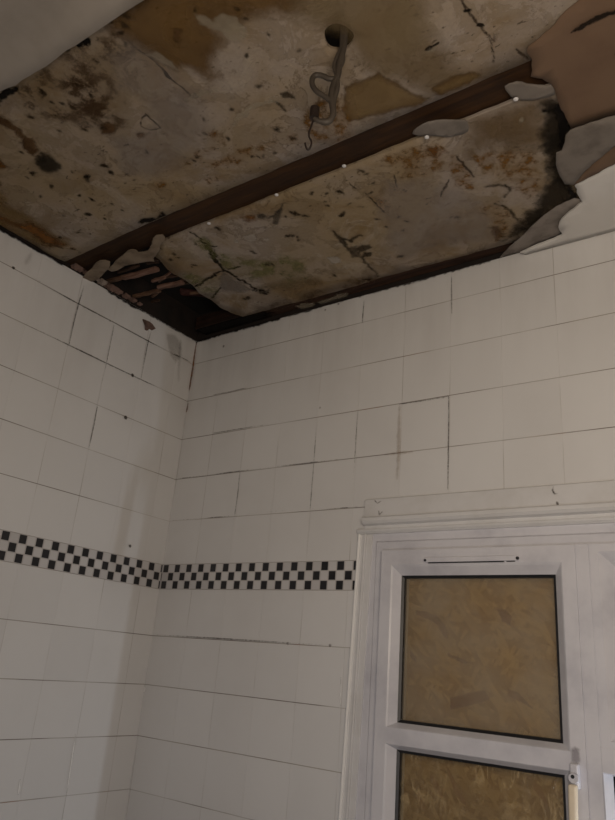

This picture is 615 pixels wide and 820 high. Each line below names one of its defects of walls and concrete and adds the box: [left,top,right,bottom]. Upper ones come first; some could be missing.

crack [461,0,494,62]
water stain [0,86,29,103]
water stain [39,0,480,141]
water stain [0,117,61,179]
water stain [473,99,578,241]
crack [189,232,270,298]
spalling [333,231,376,272]
spalling [500,198,581,257]